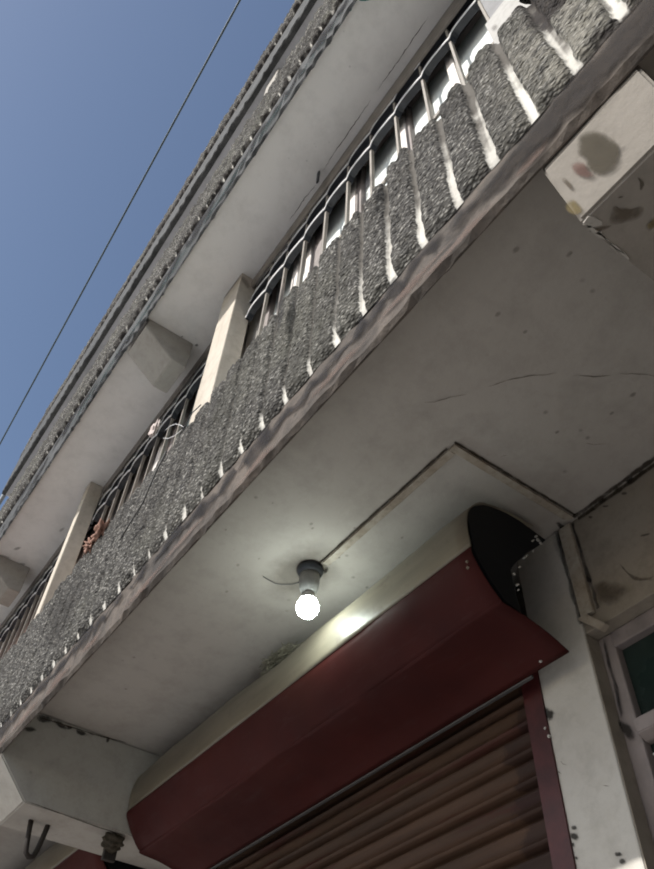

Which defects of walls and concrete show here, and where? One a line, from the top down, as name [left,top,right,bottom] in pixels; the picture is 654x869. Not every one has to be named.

leakage [455,0,654,223]
leakage [333,239,438,361]
leakage [131,369,327,588]
leakage [0,592,121,735]